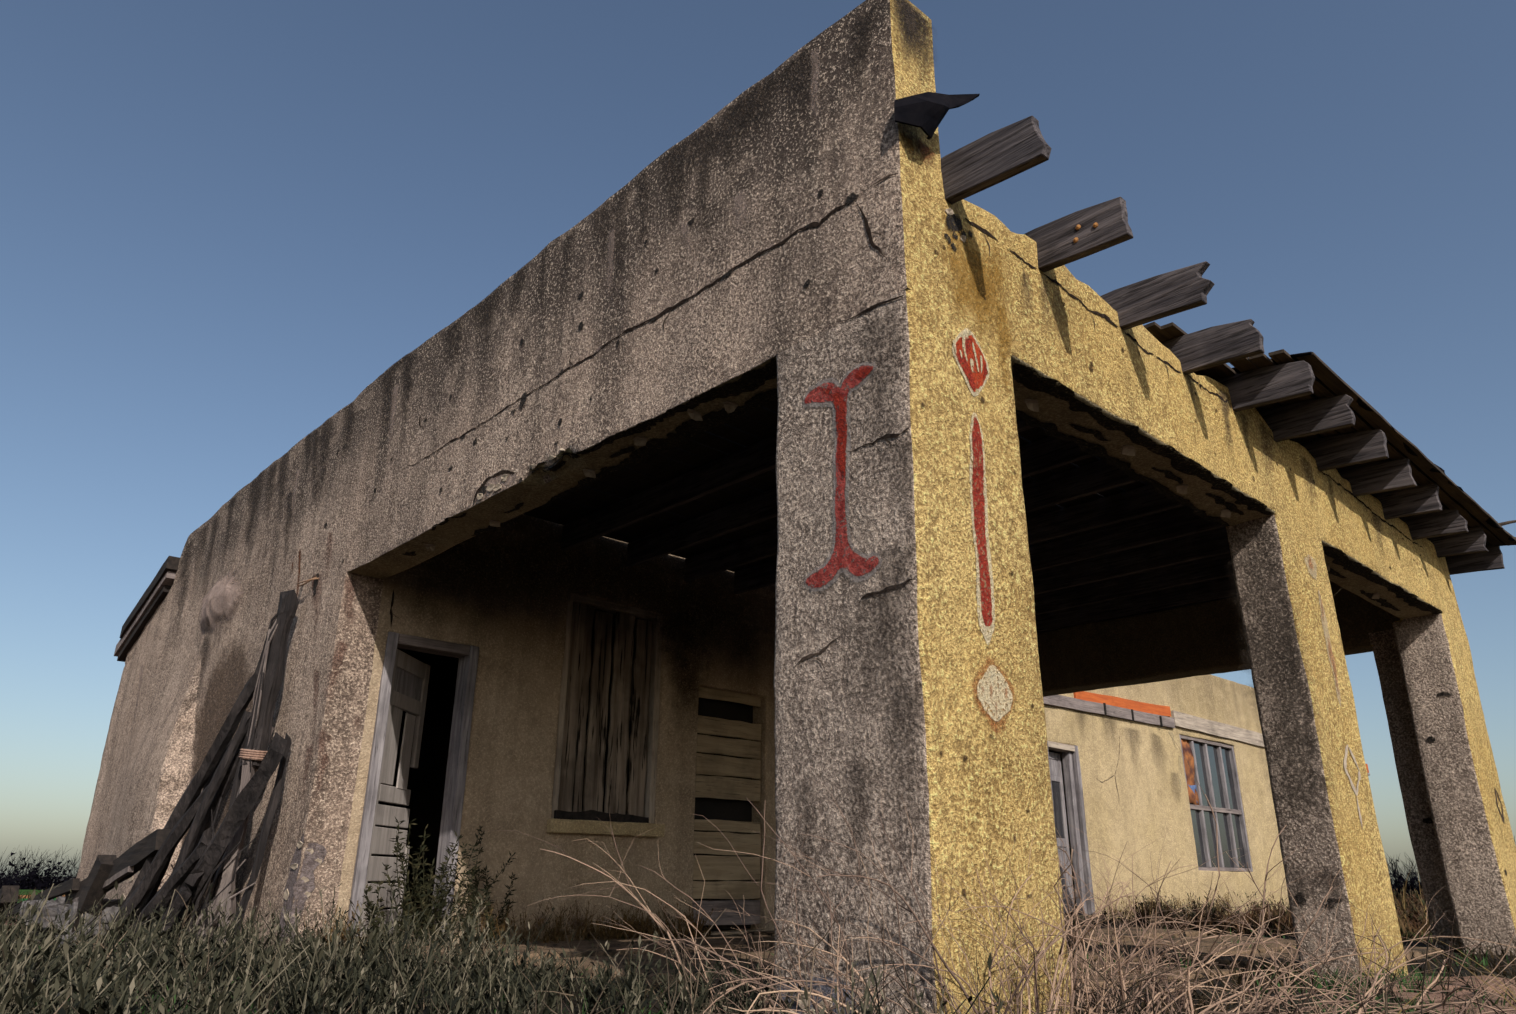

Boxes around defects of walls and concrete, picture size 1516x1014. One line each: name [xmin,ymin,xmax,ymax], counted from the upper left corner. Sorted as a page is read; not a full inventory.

damp [596,174,646,277]
damp [446,321,460,353]
damp [475,251,546,334]
crack [401,174,909,470]
crack [965,218,1228,402]
damp [383,352,414,425]
damp [183,403,354,575]
crack [859,579,913,609]
crack [794,637,840,670]